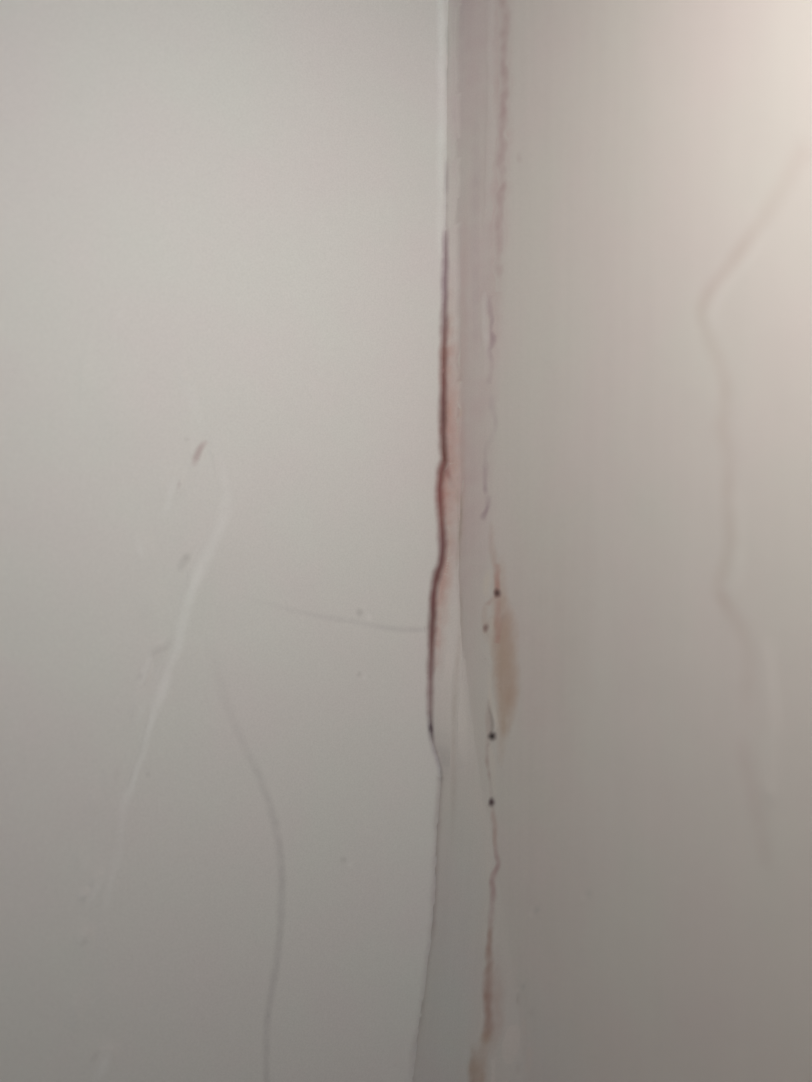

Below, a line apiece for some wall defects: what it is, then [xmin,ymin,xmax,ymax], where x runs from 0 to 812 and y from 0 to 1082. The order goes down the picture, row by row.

crack [406,155,456,1082]
rust [465,807,508,1082]
rust [480,555,522,769]
leakage [446,0,604,996]